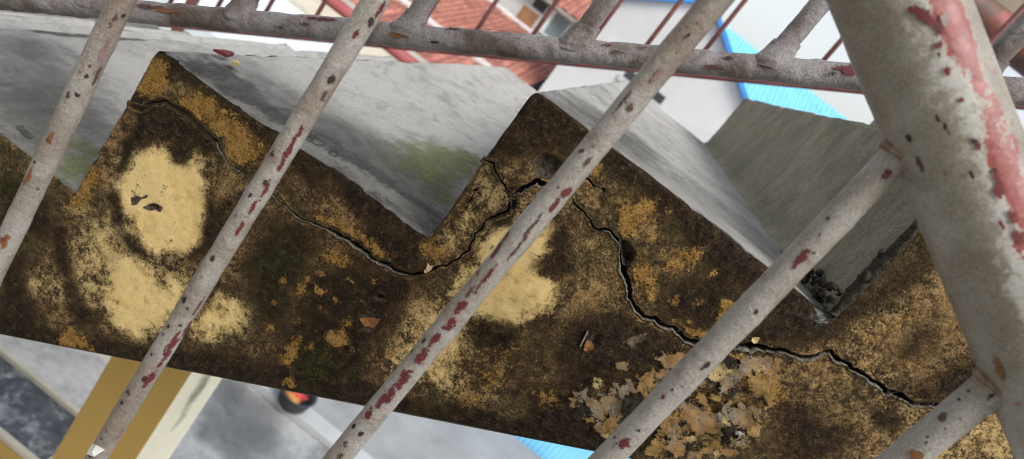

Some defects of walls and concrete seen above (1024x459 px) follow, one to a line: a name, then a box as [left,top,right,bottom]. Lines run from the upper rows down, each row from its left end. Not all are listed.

water stain [157,52,279,149]
water stain [0,74,215,361]
crack [95,216,186,272]
crack [127,97,552,282]
water stain [395,148,768,451]
crack [564,176,701,355]
spalling [791,218,920,317]
peeling [568,350,782,459]
crack [732,339,942,409]